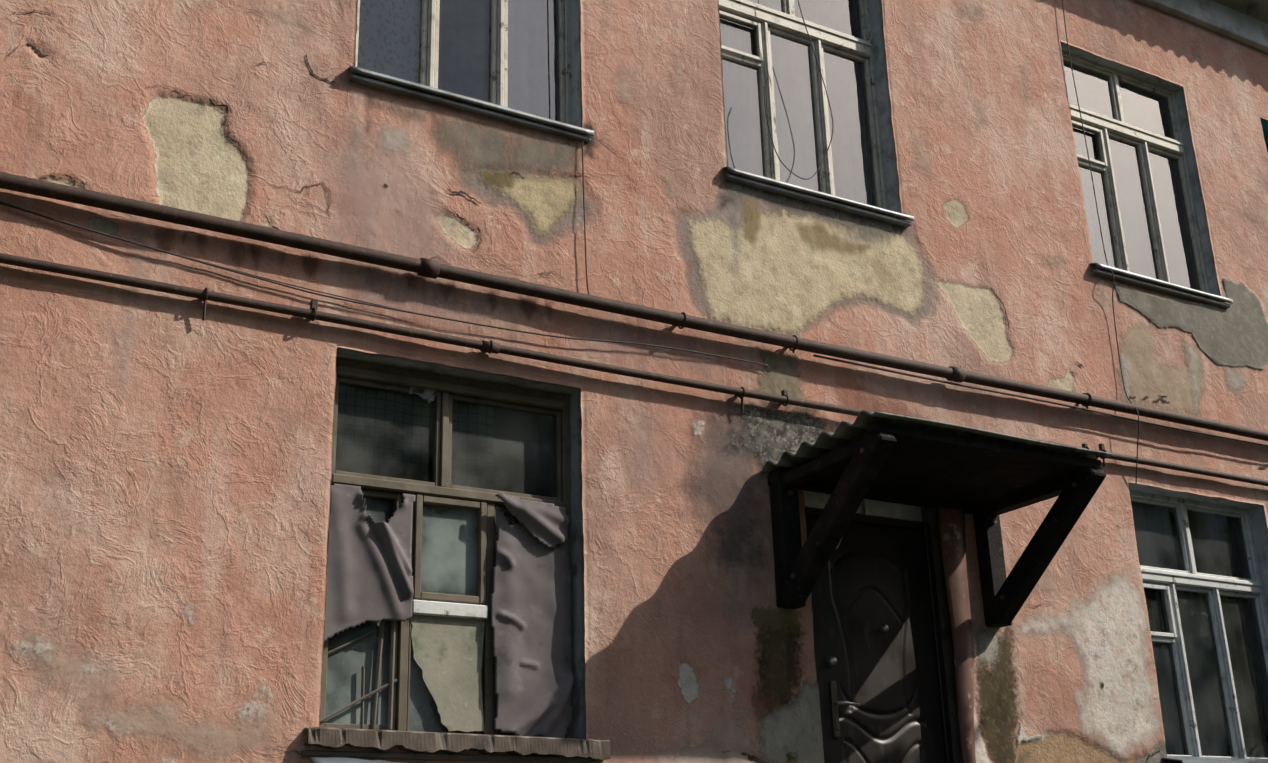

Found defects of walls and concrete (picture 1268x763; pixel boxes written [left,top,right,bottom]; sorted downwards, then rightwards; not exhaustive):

crack [5,10,62,66]
peeling [141,84,250,221]
peeling [435,207,482,250]
spalling [480,169,598,235]
spalling [688,174,1016,363]
peeling [1119,323,1205,416]
damp [691,346,837,560]
peeling [677,663,700,704]
damp [751,607,802,718]
peeling [973,625,999,763]
damp [975,627,1023,763]
peeling [1015,568,1168,763]